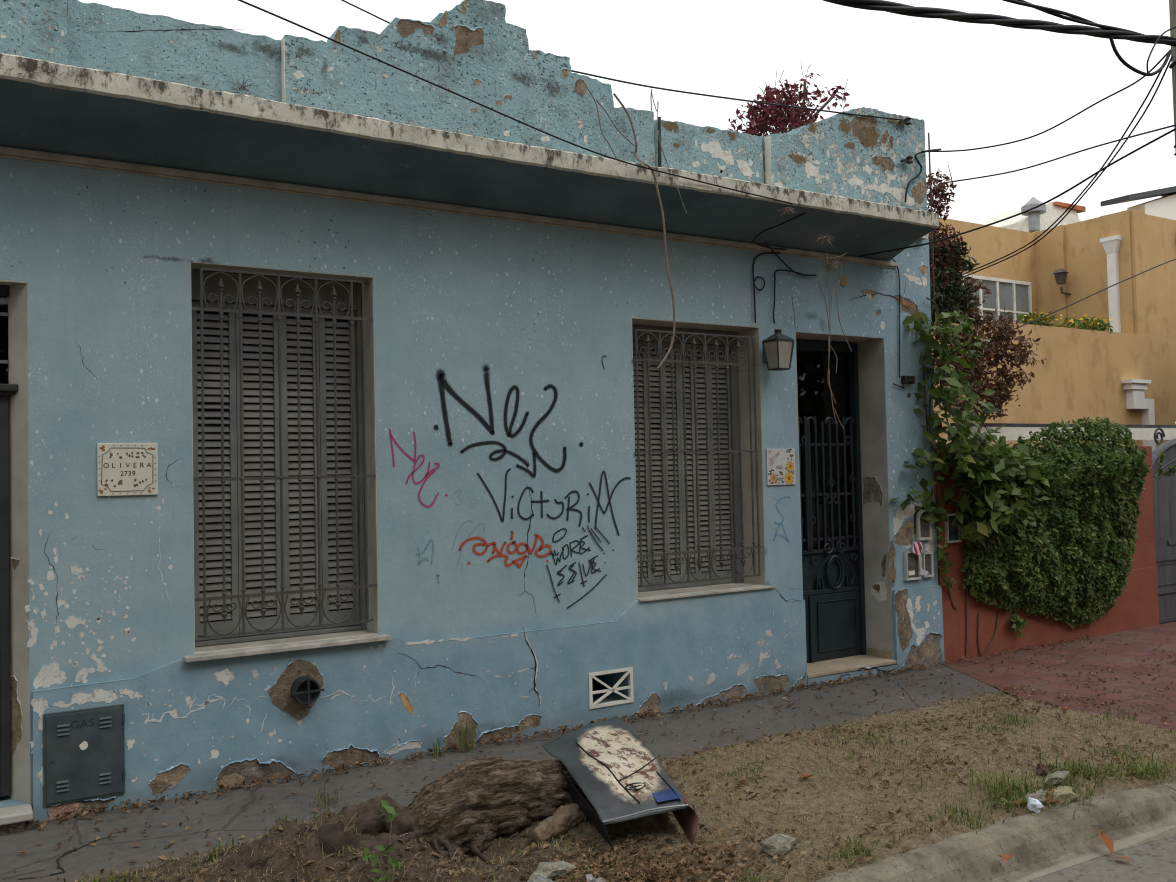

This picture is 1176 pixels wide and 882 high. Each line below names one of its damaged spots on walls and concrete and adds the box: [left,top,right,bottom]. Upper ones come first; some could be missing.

spalling [396,0,485,57]
spalling [561,68,588,98]
peeling [691,140,783,187]
peeling [792,113,927,207]
crack [317,459,562,717]
spalling [862,444,942,670]
spalling [10,542,309,795]
spalling [321,678,427,769]
peeling [405,637,471,676]
spalling [444,711,542,750]
spalling [636,681,668,717]
peeling [688,610,806,708]